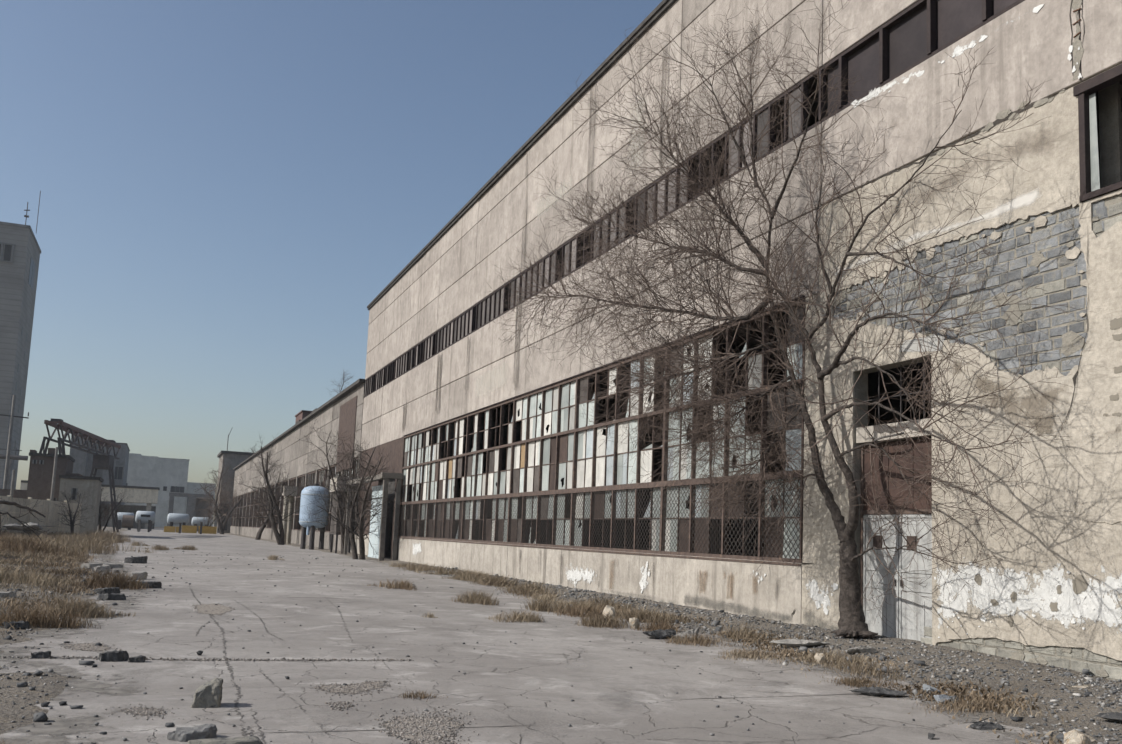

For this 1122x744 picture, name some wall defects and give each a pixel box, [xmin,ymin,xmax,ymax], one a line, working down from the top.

spalling [938,19,1020,64]
spalling [1067,0,1084,81]
spalling [852,70,924,108]
spalling [829,199,1122,433]
crack [1062,227,1089,428]
peeling [806,577,838,615]
peeling [921,557,1122,681]